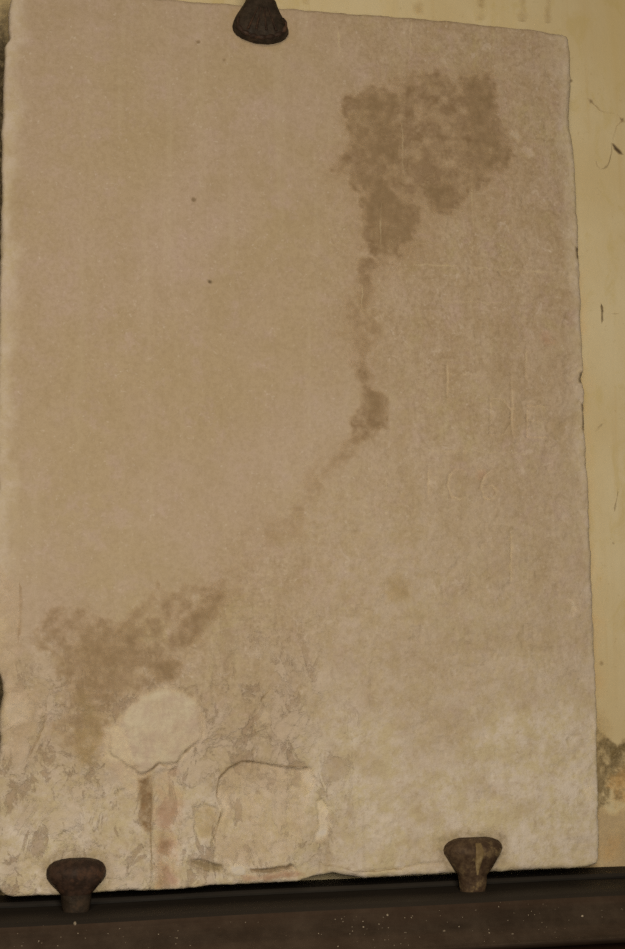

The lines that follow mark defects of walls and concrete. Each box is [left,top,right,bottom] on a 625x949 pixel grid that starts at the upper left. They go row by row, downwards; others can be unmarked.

leakage [341,70,511,307]
leakage [351,370,388,442]
mould [596,737,625,806]